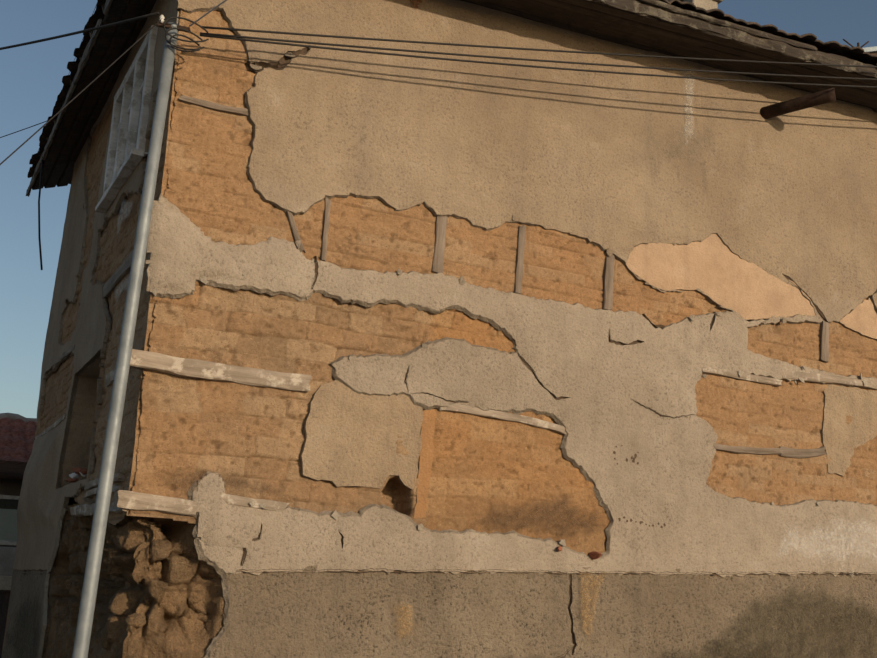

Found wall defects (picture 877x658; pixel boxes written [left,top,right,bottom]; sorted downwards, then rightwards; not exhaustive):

flaking render [34,82,158,505]
flaking render [154,6,877,507]
crack [784,274,829,323]
flaking render [107,200,614,658]
crack [518,353,570,400]
spalling [38,507,66,658]
crack [239,524,877,658]